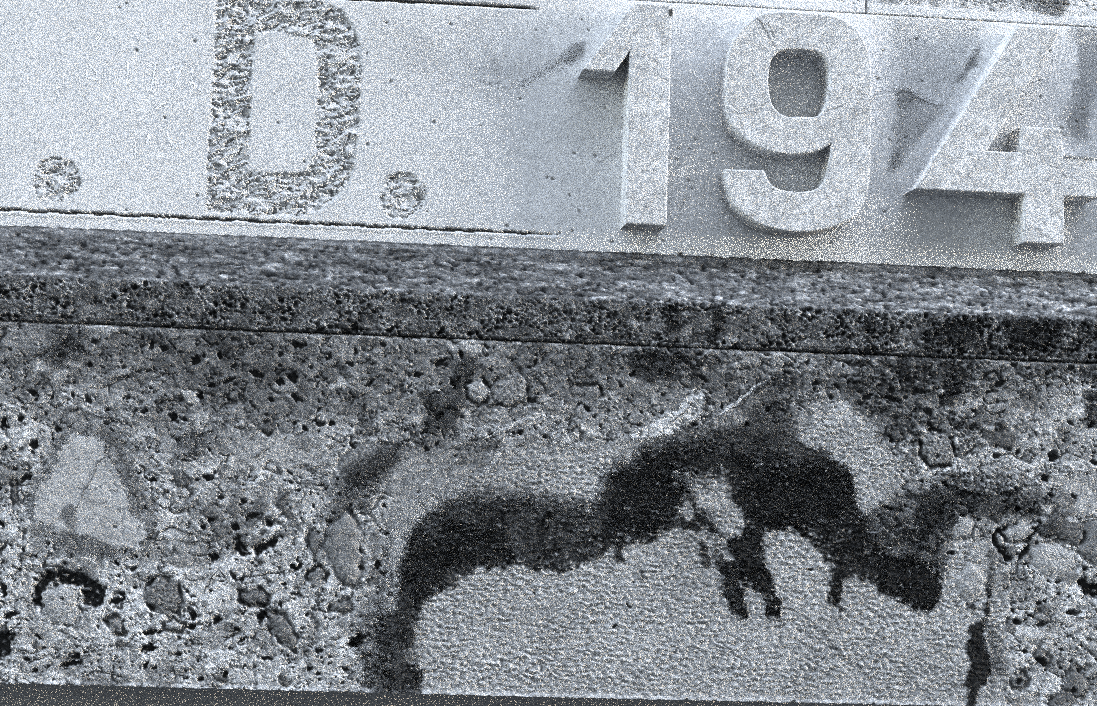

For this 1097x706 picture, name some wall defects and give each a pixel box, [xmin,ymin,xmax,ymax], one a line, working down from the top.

leakage [361,379,956,694]
leakage [955,545,1005,706]